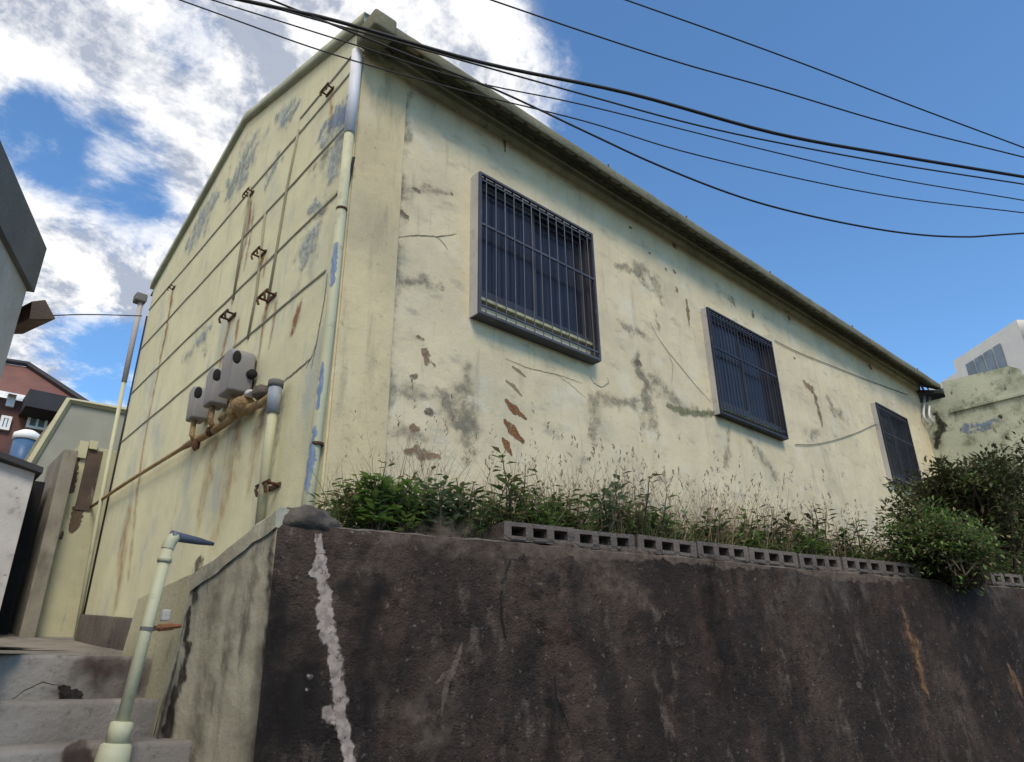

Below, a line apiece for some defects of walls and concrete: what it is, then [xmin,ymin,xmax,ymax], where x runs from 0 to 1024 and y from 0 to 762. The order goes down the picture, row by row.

peeling [319,104,347,183]
peeling [185,131,258,252]
peeling [299,197,325,271]
peeling [304,426,317,494]
peeling [409,335,436,379]
water stain [441,365,476,446]
spalling [502,399,527,456]
water stain [590,354,715,427]
rust [803,380,823,427]
water stain [933,405,967,449]
water stain [156,556,204,739]
rust [902,608,930,699]